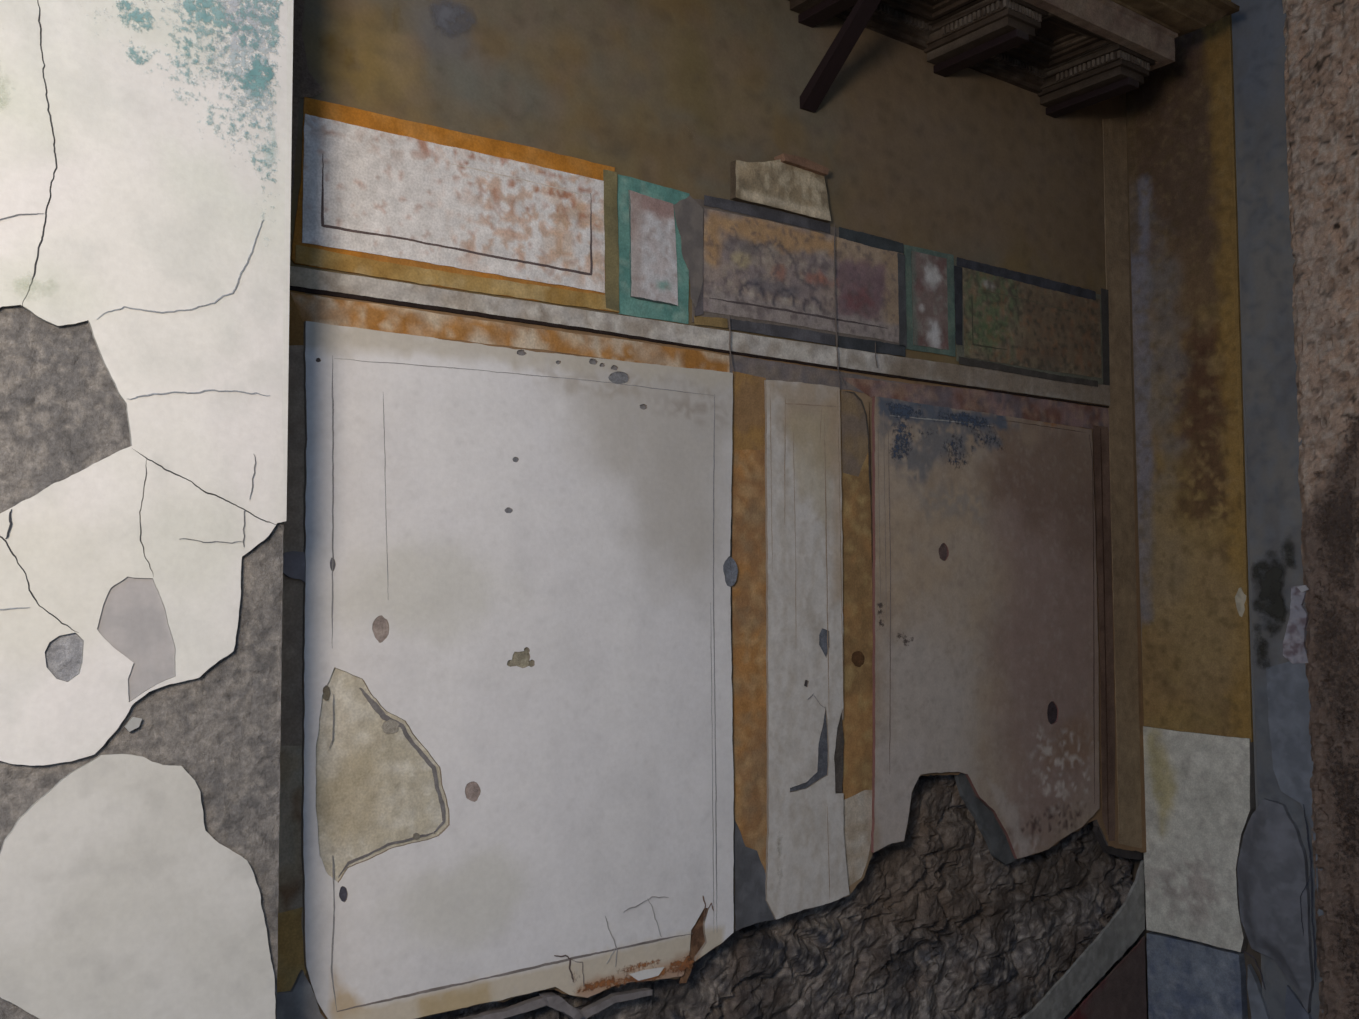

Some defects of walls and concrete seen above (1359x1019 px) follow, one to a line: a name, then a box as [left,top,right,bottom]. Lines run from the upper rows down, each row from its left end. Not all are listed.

crack [0,0,57,308]
crack [97,222,262,319]
spalling [0,306,131,513]
crack [131,389,270,399]
crack [0,509,79,633]
crack [133,449,280,573]
damp [1252,542,1295,667]
spalling [0,522,284,1019]
peeling [316,668,448,902]
peeling [790,712,844,793]
spalling [422,775,1136,1019]
corrosion [578,955,694,992]